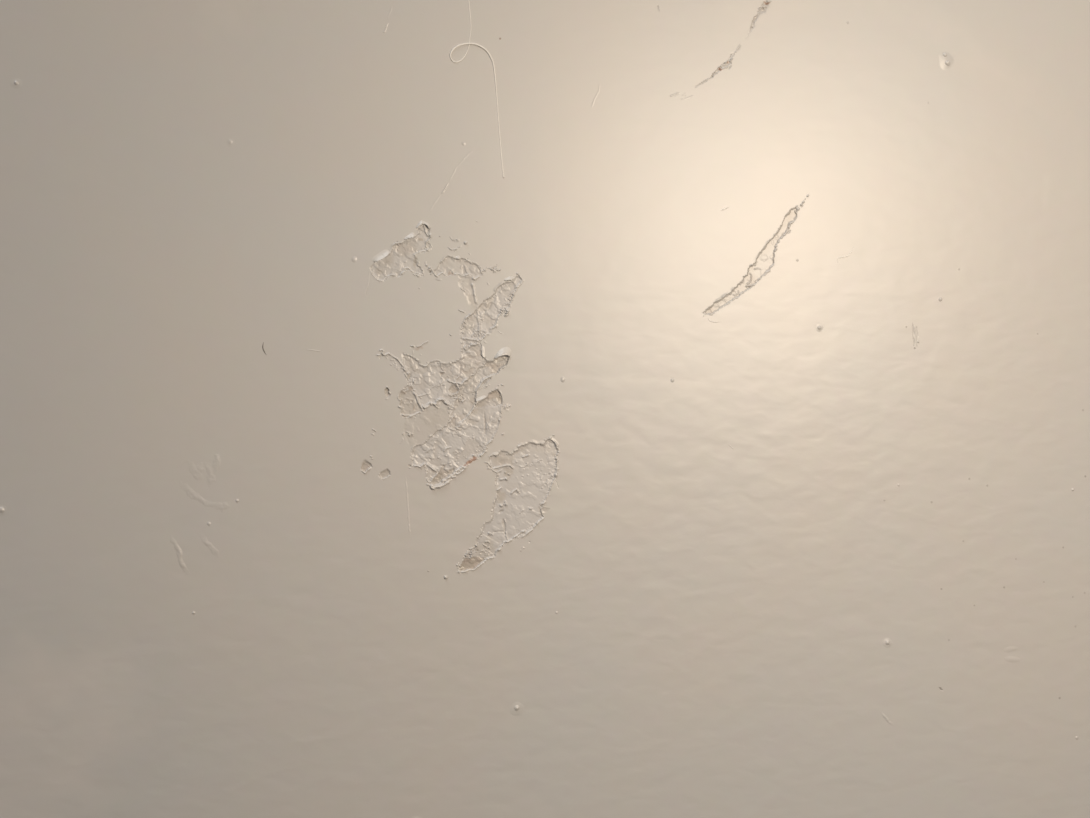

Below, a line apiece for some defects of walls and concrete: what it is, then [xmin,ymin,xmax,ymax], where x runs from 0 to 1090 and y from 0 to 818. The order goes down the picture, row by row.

peeling [369,220,560,574]
spalling [702,194,809,315]